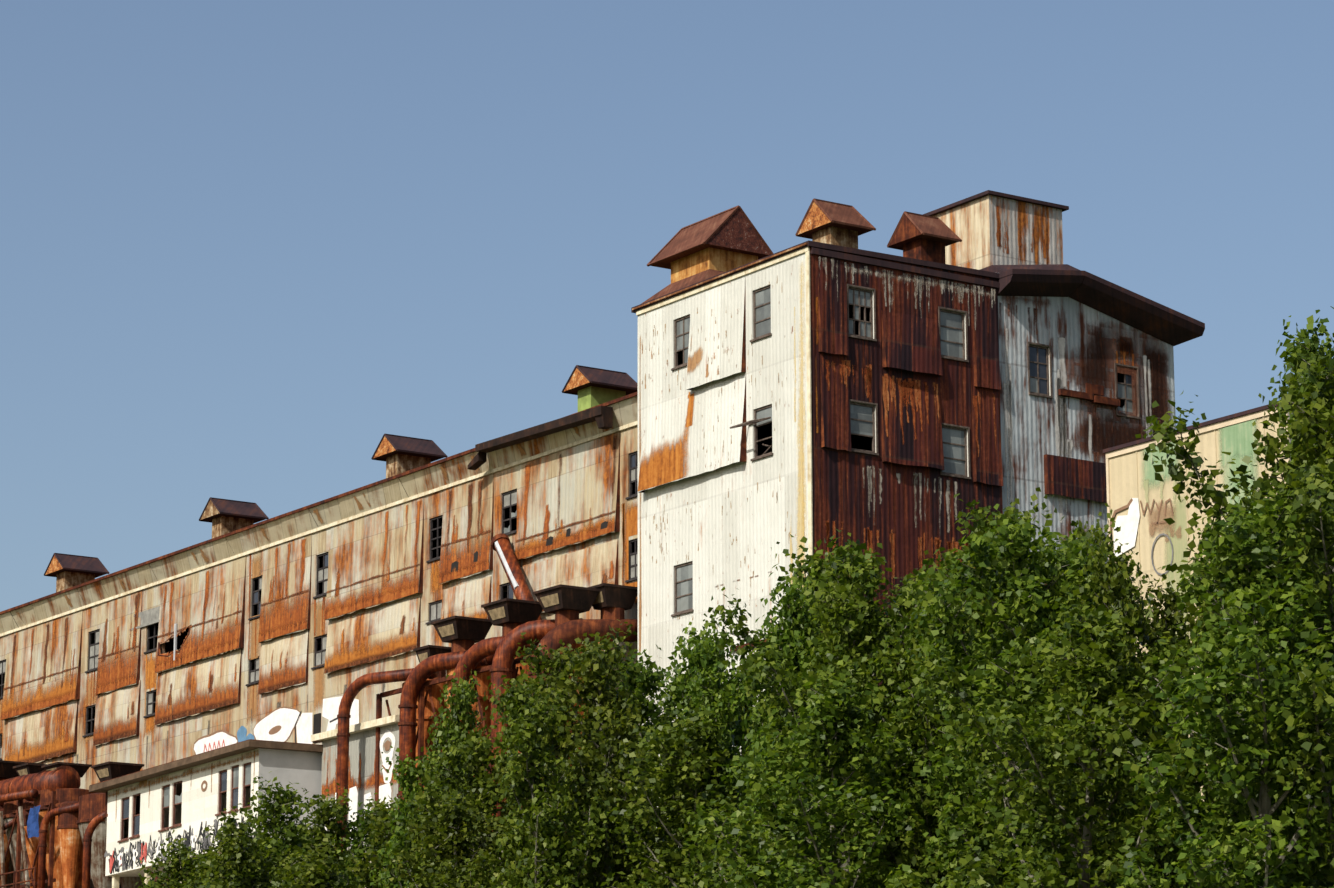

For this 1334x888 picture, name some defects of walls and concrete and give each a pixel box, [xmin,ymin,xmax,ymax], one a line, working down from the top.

corrosion [996,206,1046,258]
corrosion [816,359,940,445]
corrosion [973,392,996,457]
water stain [1003,328,1013,506]
water stain [1055,337,1092,461]
corrosion [515,392,694,652]
corrosion [864,527,895,579]
corrosion [863,466,975,569]
corrosion [0,456,491,763]
corrosion [322,754,397,796]